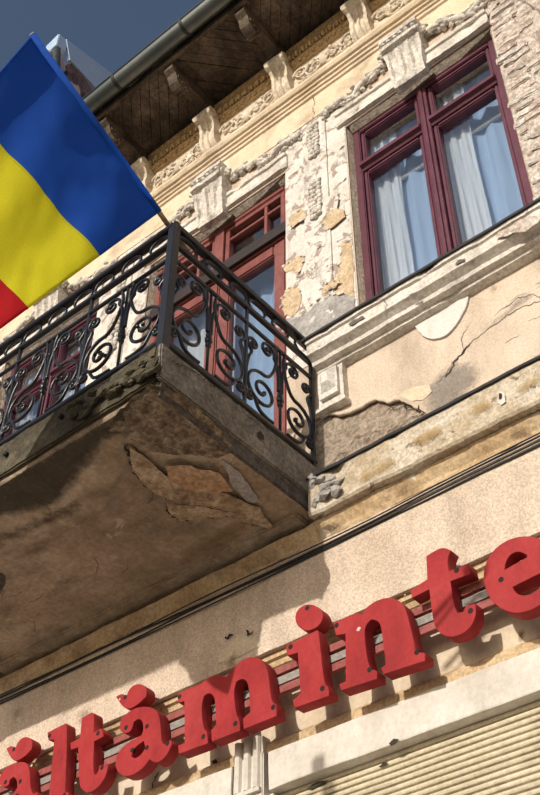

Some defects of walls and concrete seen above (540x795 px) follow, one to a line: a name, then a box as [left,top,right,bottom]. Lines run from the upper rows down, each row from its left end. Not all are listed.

flaking render [479,0,540,201]
peeling [321,208,345,230]
peeling [315,239,354,300]
crack [435,282,540,384]
flaking render [108,384,274,530]
flaking render [315,385,432,470]